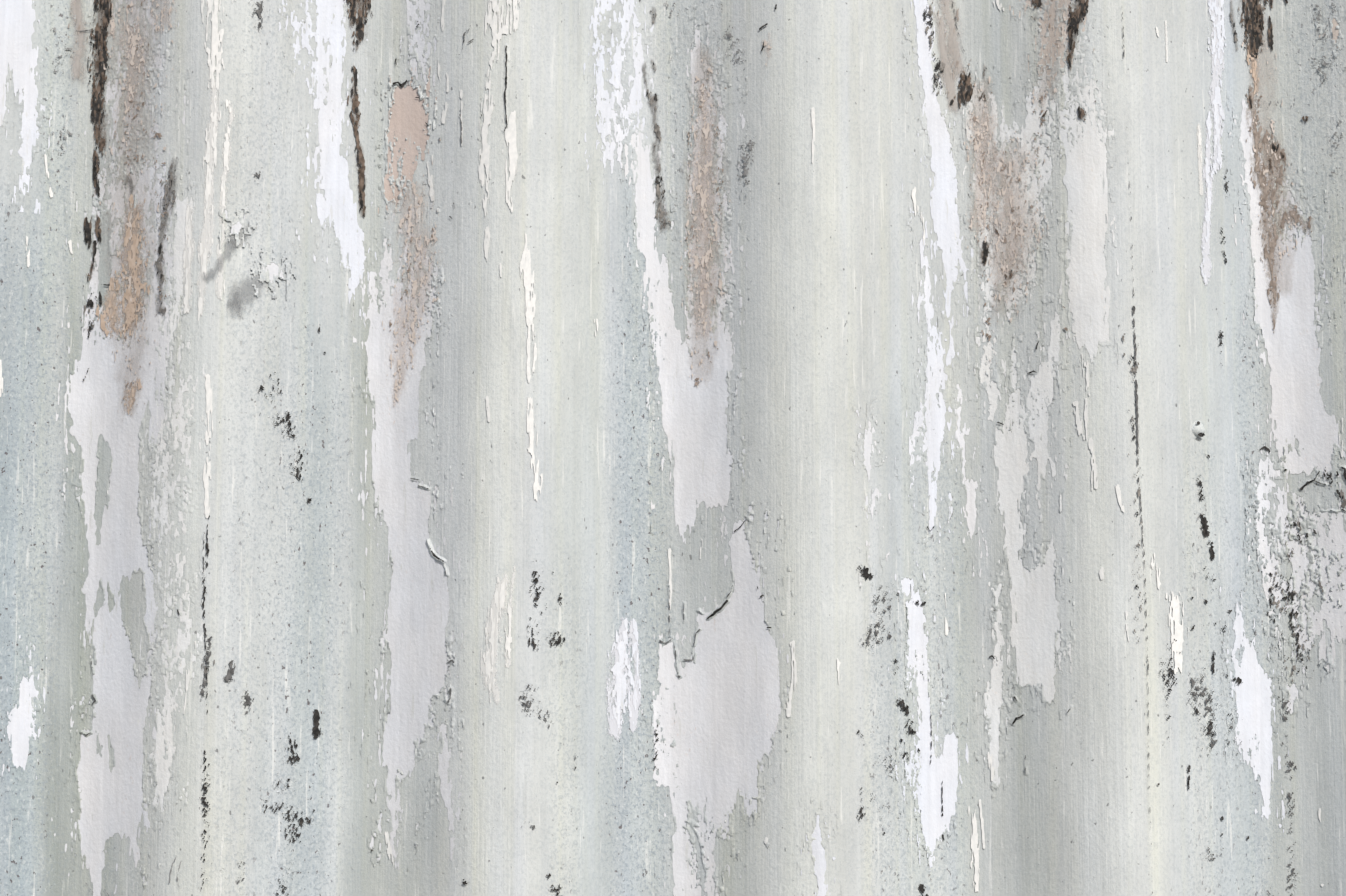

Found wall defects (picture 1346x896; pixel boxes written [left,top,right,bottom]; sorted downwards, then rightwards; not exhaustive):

rust [96,194,150,338]
peeling [0,0,256,896]
peeling [218,0,469,896]
peeling [578,0,796,896]
peeling [785,797,843,896]
peeling [851,0,1119,869]
peeling [1157,90,1346,896]
rust [1246,49,1312,333]
peeling [1304,0,1346,85]